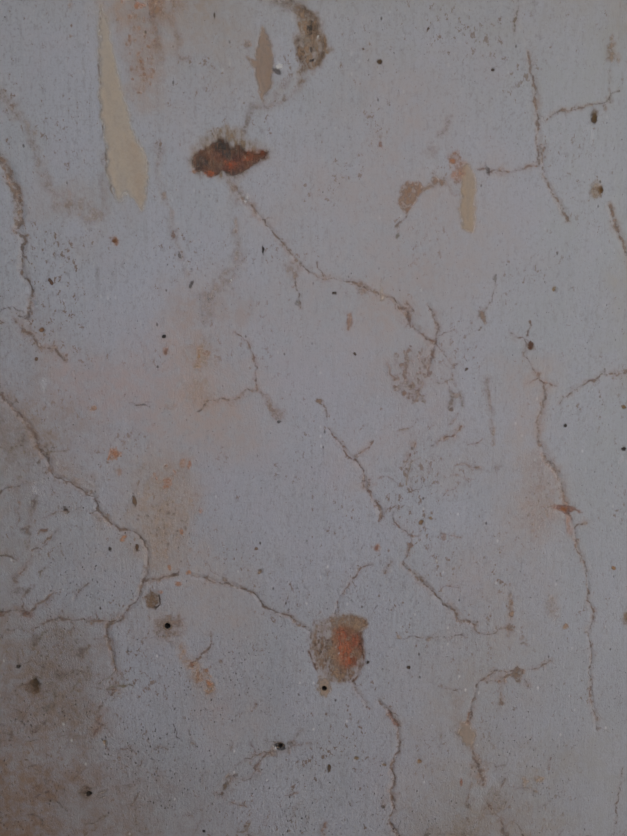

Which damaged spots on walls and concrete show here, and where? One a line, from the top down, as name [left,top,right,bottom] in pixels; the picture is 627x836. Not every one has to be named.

peeling [251,28,282,98]
flaking render [296,6,328,67]
crack [487,55,544,173]
crack [0,158,65,360]
crack [610,205,626,252]
crack [352,282,436,356]
crack [332,434,413,549]
crack [0,395,178,733]
crack [204,577,306,627]
crack [467,667,523,723]
crack [369,701,400,826]